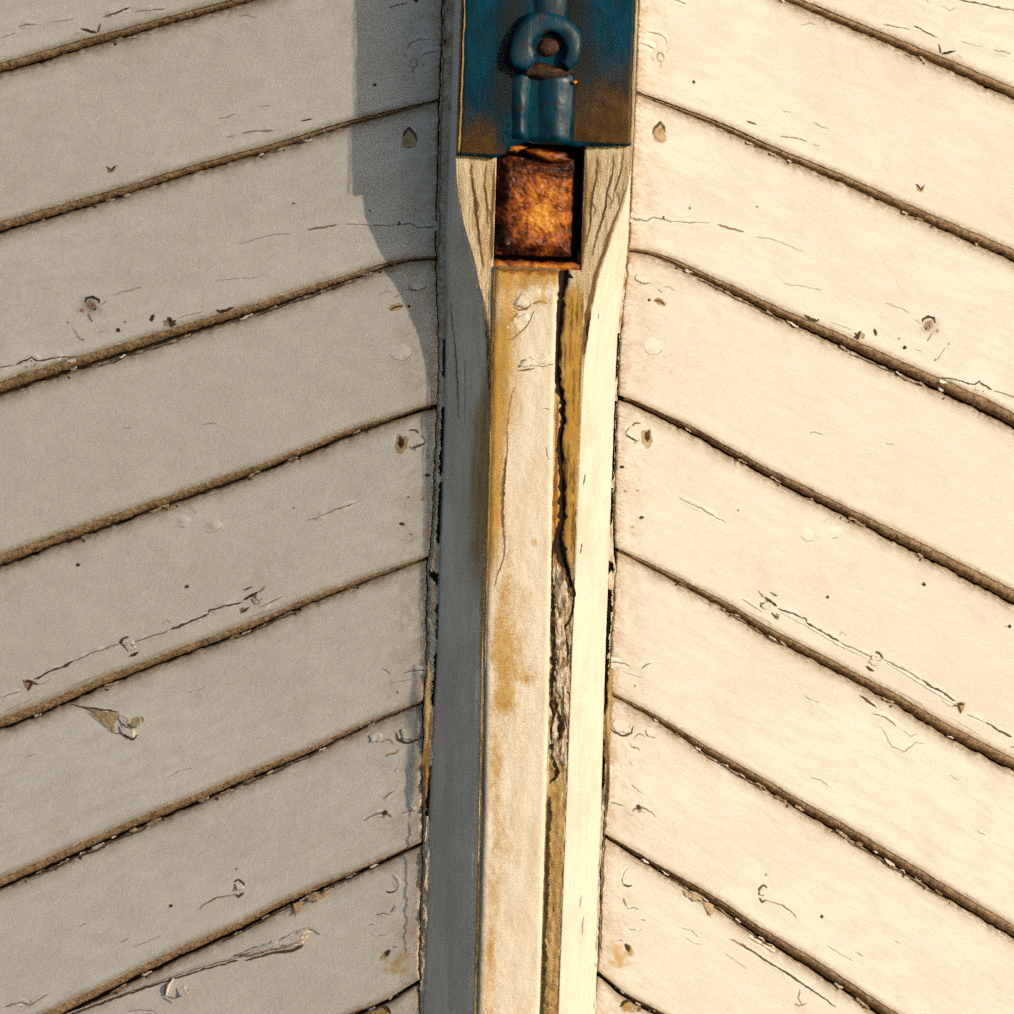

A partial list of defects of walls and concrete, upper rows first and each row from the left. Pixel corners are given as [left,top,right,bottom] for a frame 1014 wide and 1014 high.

crack [104,3,166,19]
crack [883,20,937,39]
crack [946,0,1014,15]
crack [307,0,449,282]
crack [450,303,459,419]
peeling [507,290,543,336]
crack [470,163,599,783]
rust [473,157,626,1014]
spalling [72,704,144,741]
crack [0,593,284,701]
crack [742,596,1014,752]
peeling [66,926,320,1014]